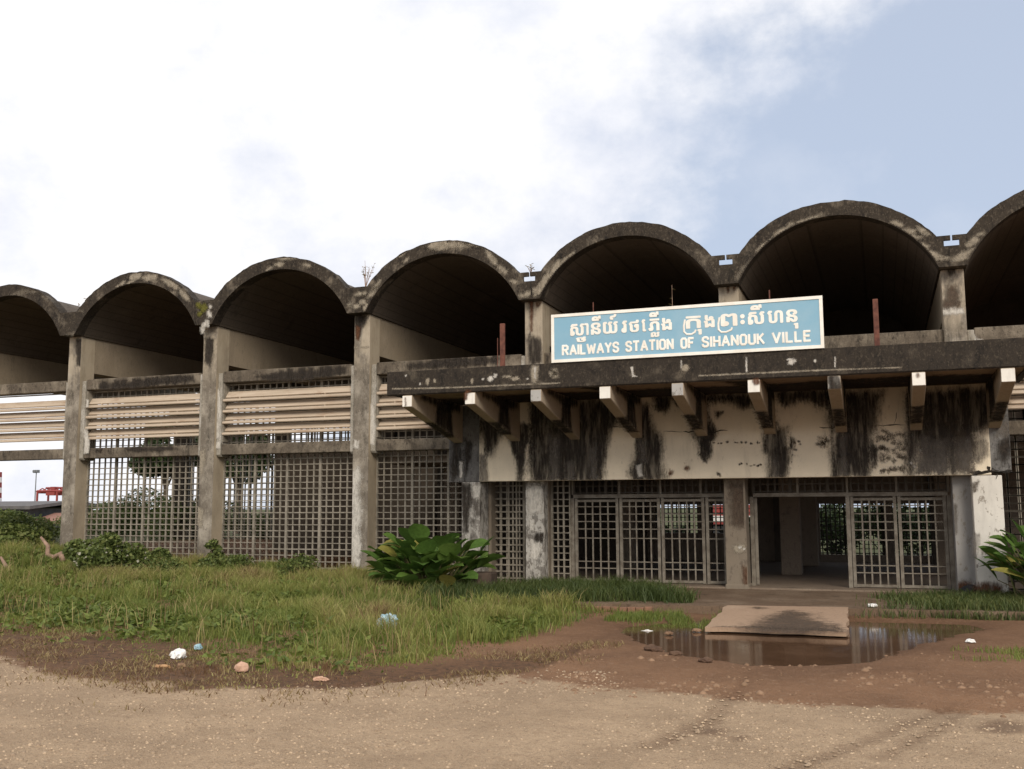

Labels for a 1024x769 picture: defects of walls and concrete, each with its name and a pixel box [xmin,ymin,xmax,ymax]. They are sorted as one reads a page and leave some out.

leakage [392,356,1011,533]